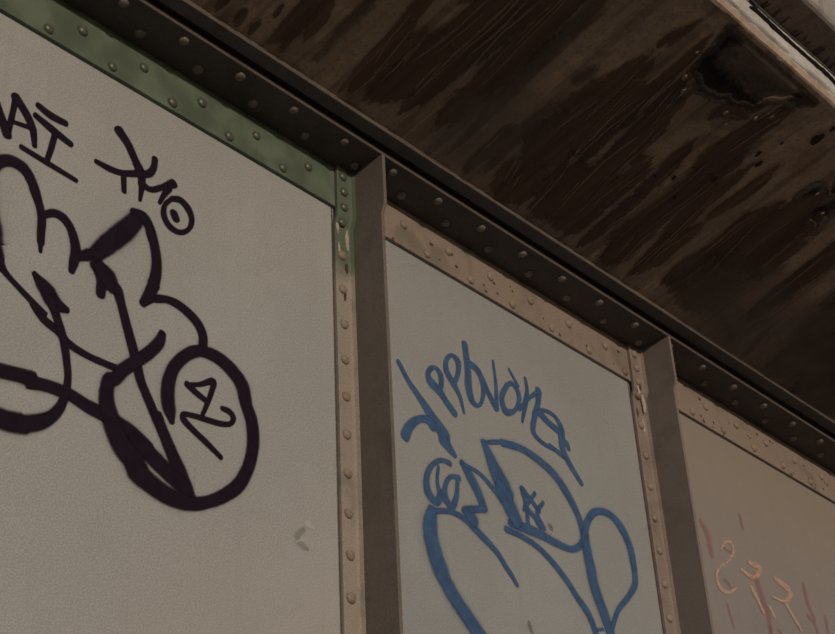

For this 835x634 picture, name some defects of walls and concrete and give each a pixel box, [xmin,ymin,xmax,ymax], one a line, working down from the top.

leakage [266,0,335,54]
leakage [338,0,608,155]
spalling [681,24,820,126]
crack [749,0,835,84]
leakage [462,19,835,324]